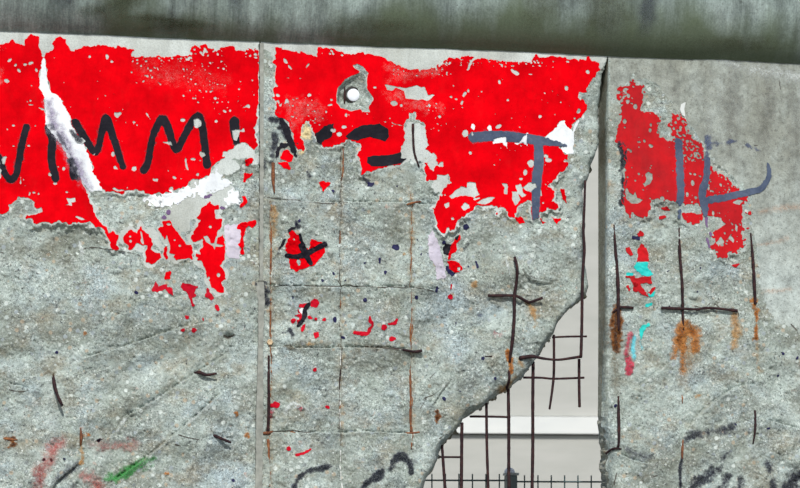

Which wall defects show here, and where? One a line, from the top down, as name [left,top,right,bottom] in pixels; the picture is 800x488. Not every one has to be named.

spalling [0,34,259,488]
spalling [261,47,800,488]
corrosion [499,349,523,393]
corrosion [609,304,623,374]
corrosion [672,320,701,373]
corrosion [731,313,742,349]
corrosion [750,297,760,356]